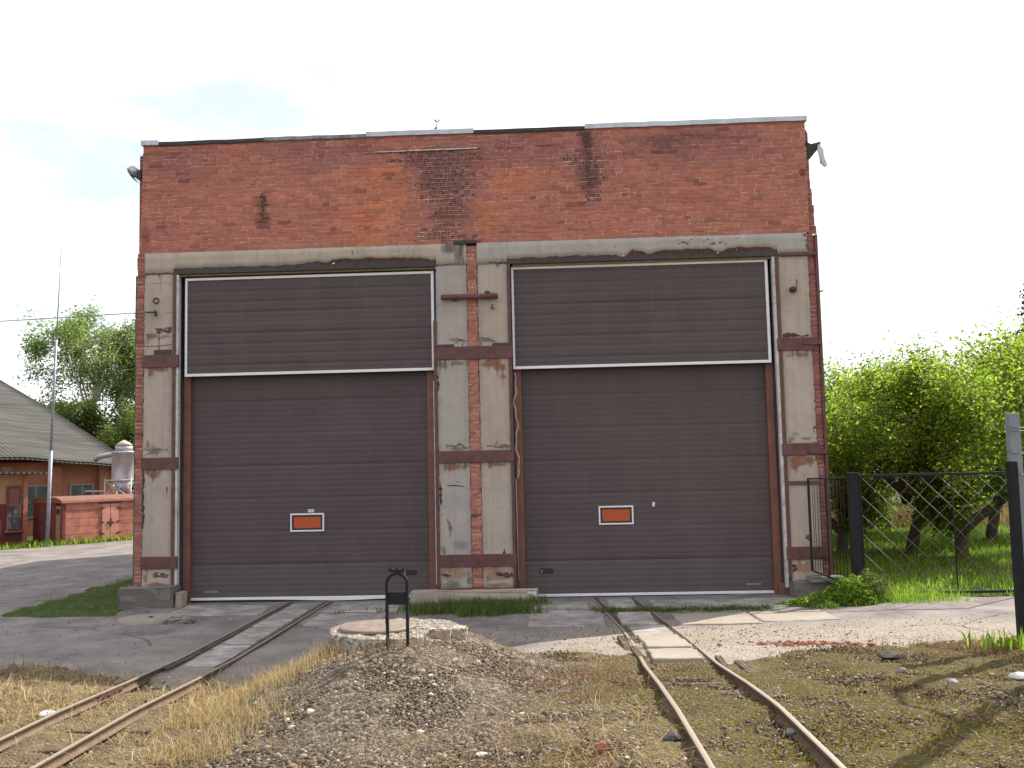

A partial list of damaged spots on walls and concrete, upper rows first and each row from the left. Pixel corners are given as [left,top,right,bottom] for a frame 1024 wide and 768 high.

spalling [614,238,770,256]
spalling [318,254,430,266]